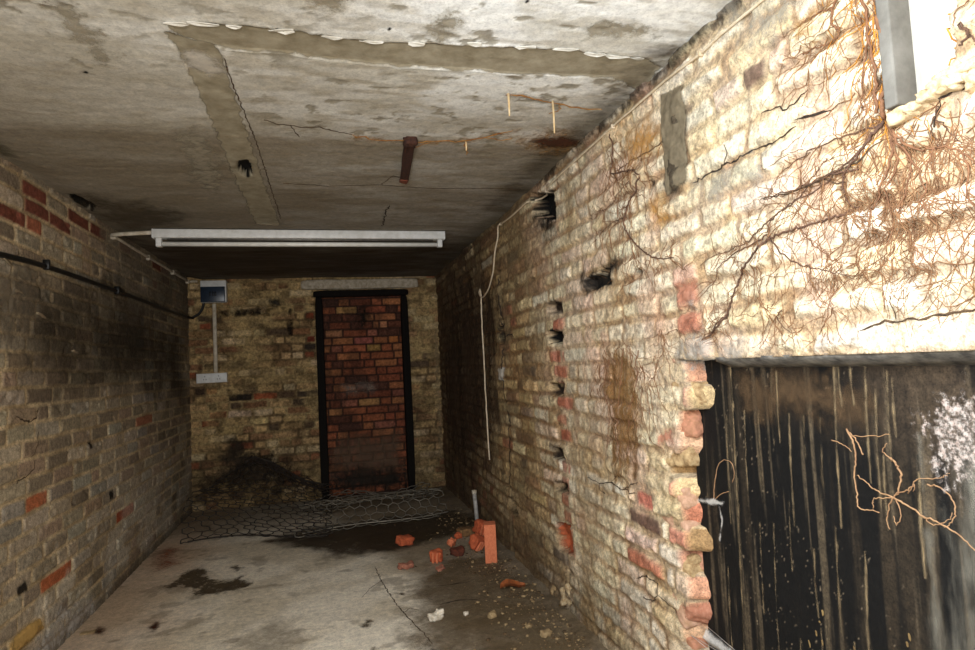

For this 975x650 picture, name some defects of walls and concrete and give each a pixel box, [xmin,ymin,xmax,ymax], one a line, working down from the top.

peeling [163,21,242,29]
peeling [408,13,462,47]
peeling [587,22,648,38]
peeling [553,48,644,60]
crack [224,59,602,218]
corrosion [517,131,579,155]
crack [693,93,834,183]
crack [344,176,521,226]
crack [860,286,975,331]
spalling [550,329,564,343]
damp [922,398,975,529]
damp [919,476,930,578]